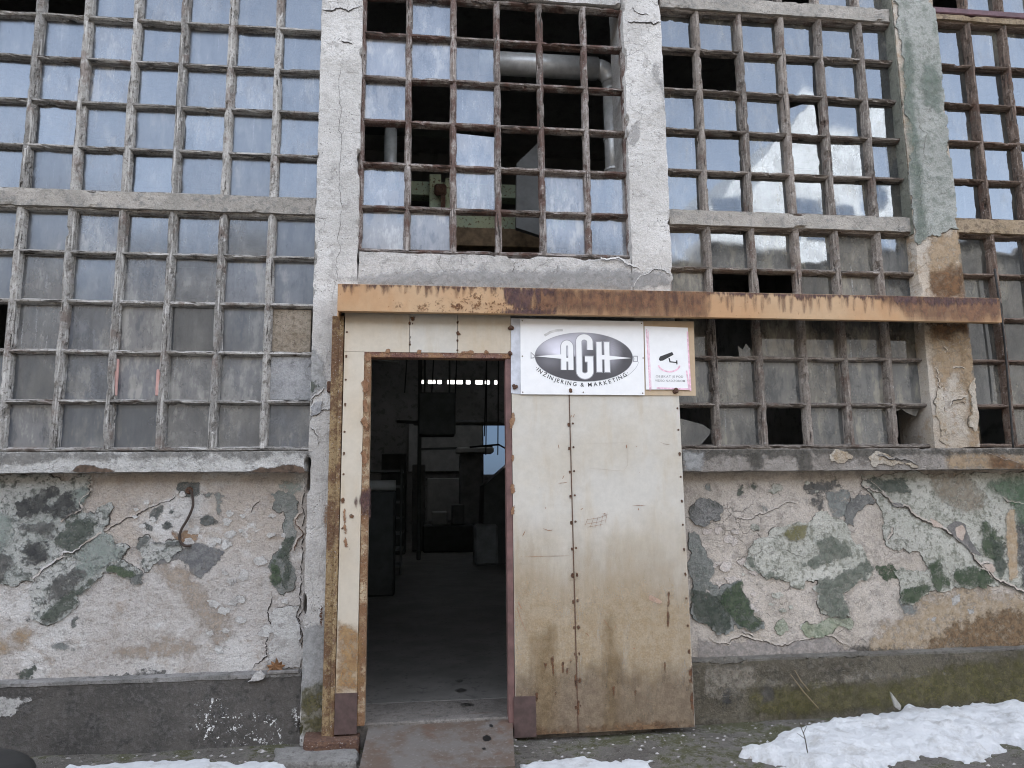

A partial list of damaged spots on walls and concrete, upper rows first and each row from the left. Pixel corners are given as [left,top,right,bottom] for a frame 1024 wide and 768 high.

crack [322,4,360,12]
water stain [901,41,927,240]
rust [342,232,1024,469]
spalling [933,378,979,445]
crack [32,493,176,580]
peeling [0,464,305,654]
rust [172,530,198,544]
rust [176,482,200,497]
crack [251,474,324,670]
rust [341,487,371,547]
peeling [687,449,1024,657]
crack [863,454,1024,593]